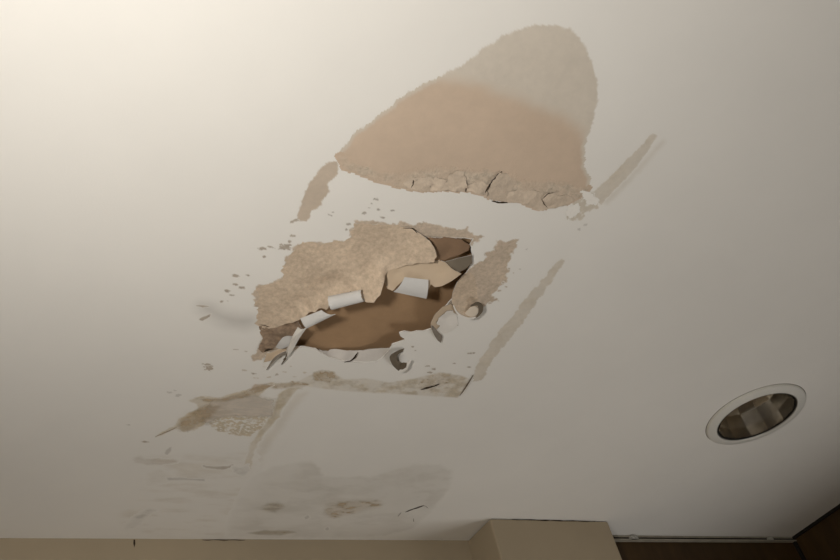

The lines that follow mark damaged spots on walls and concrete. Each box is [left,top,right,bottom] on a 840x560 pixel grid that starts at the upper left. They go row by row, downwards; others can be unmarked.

damp [334,23,669,211]
peeling [289,160,339,224]
peeling [256,234,296,258]
peeling [447,238,528,326]
peeling [140,373,279,443]